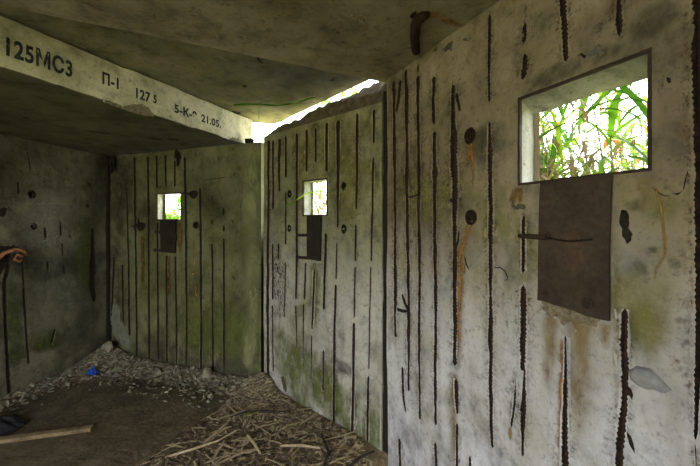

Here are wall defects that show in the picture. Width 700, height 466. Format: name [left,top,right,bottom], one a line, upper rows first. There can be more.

spalling [103,100,154,117]
spalling [619,210,633,244]